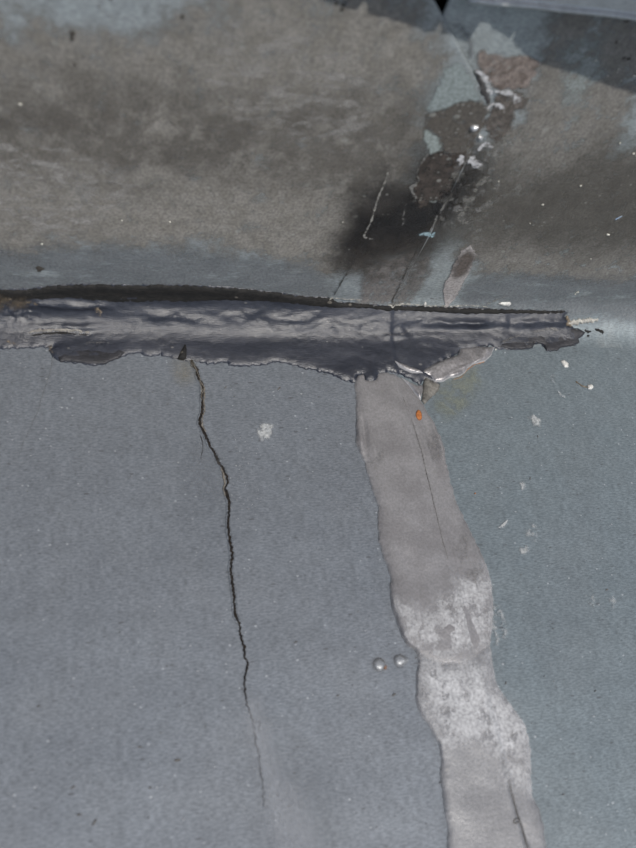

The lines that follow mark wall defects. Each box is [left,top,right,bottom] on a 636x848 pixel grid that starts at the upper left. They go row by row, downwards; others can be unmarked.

water stain [0,0,636,287]
crack [188,359,265,806]